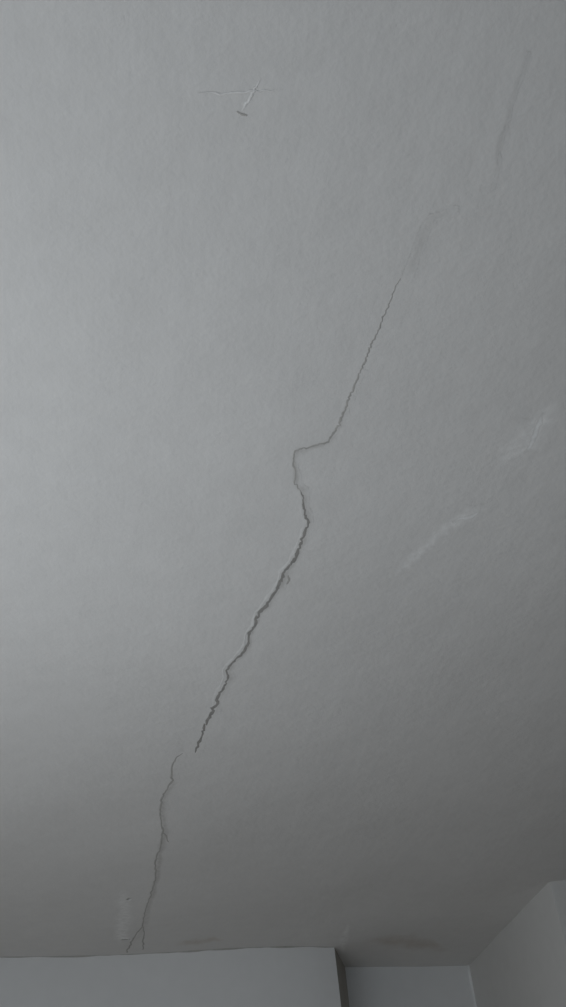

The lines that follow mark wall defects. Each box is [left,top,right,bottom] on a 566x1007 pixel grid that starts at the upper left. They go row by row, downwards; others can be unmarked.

crack [1,205,459,958]